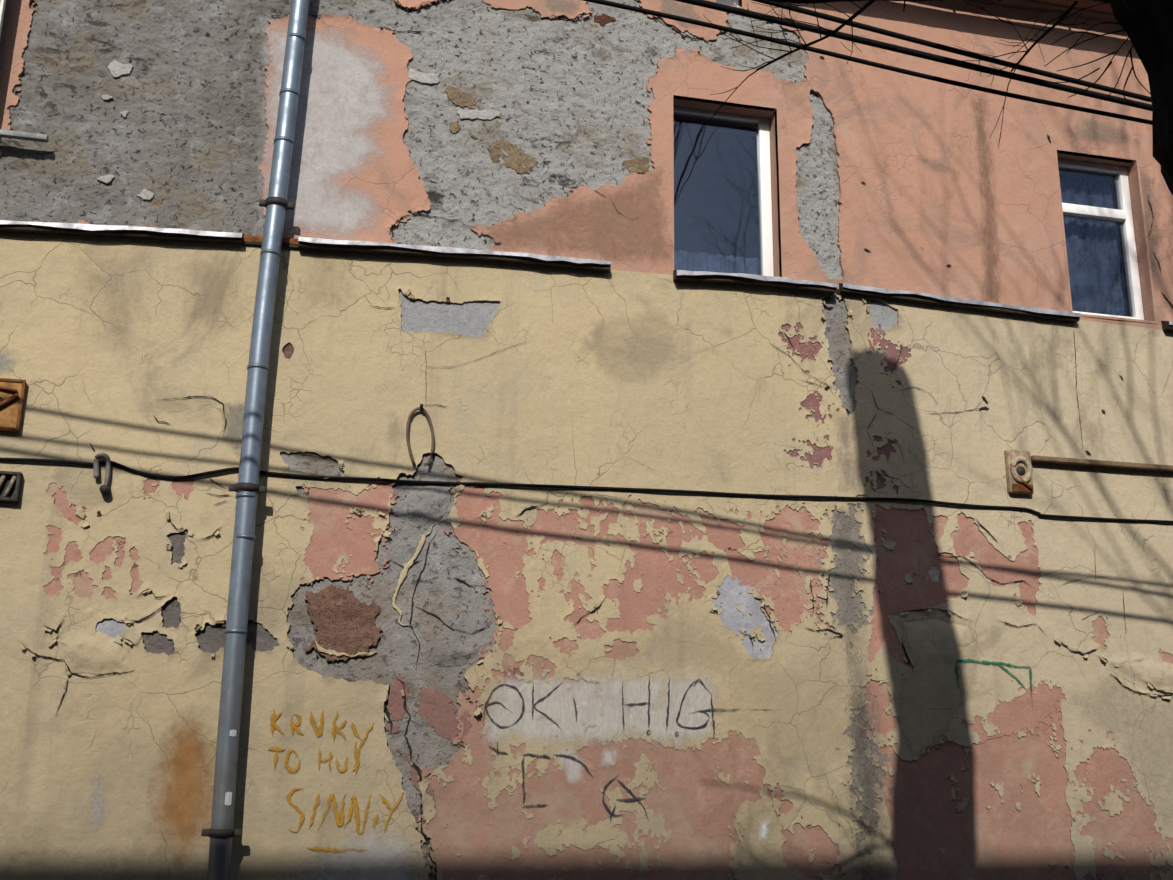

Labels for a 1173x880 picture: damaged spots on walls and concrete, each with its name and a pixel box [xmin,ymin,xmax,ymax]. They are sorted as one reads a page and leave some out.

flaking render [0,0,291,236]
flaking render [308,0,911,472]
crack [154,396,227,434]
flaking render [43,482,143,599]
flaking render [165,527,194,568]
flaking render [141,597,226,657]
crack [380,530,490,880]
flaking render [246,433,1173,880]
crack [807,575,843,637]
crack [926,554,1126,626]
crack [1001,621,1173,699]
rust [164,731,209,838]